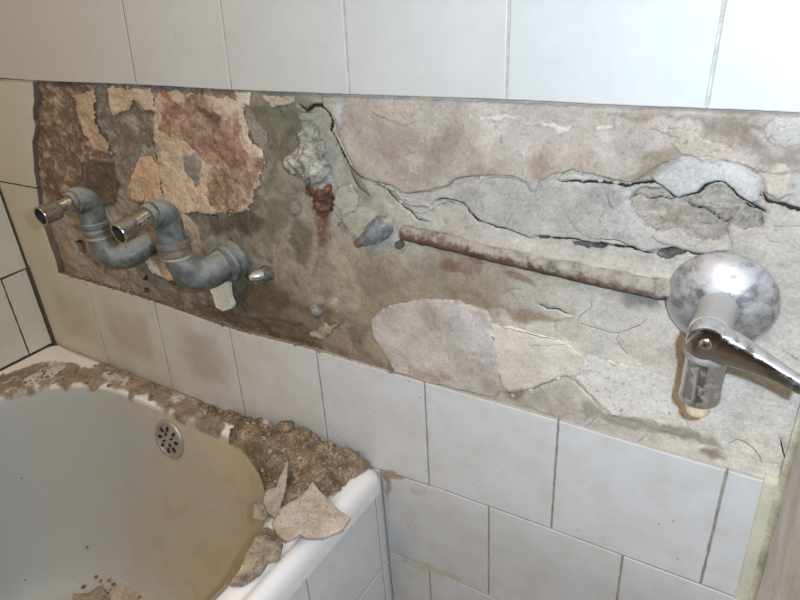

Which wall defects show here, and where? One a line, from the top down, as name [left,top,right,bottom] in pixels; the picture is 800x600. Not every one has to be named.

peeling [262,95,295,107]
spalling [36,83,268,243]
crack [300,103,701,255]
peeling [322,96,800,259]
rust [306,184,335,243]
crack [559,168,800,250]
peeling [146,254,174,281]
rust [507,271,533,284]
peeling [309,321,339,339]
crack [537,302,648,356]
peeling [371,299,689,437]